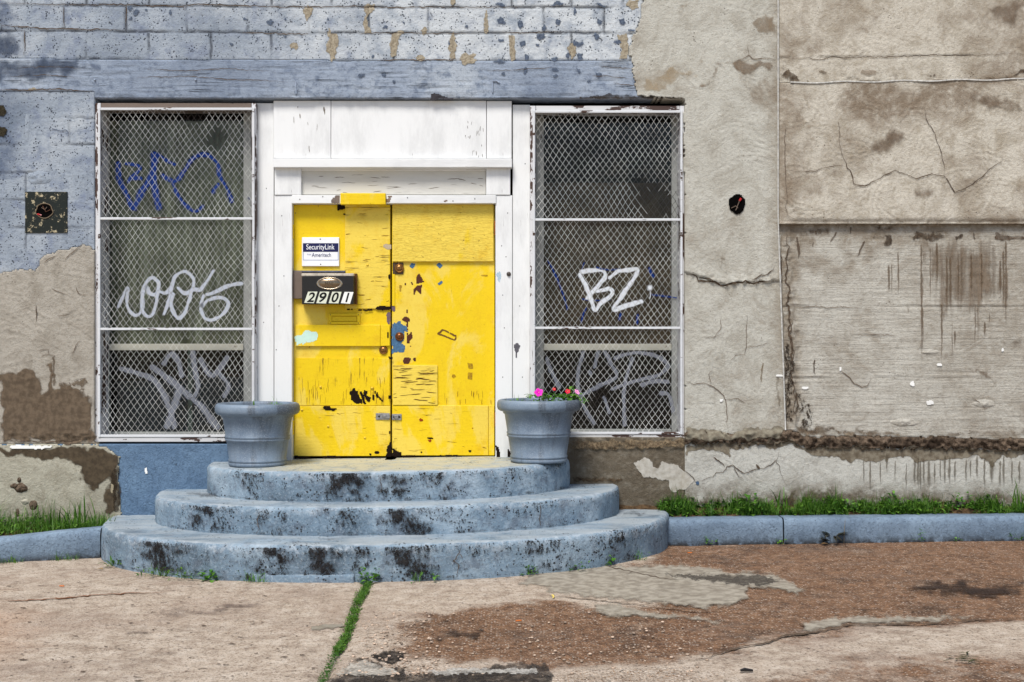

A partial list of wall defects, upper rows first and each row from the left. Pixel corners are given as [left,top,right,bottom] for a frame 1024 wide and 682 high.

peeling [363,4,405,57]
peeling [448,25,477,65]
peeling [484,3,561,75]
peeling [551,3,606,83]
peeling [613,0,639,59]
crack [686,114,1009,432]
leakage [685,345,1024,484]
flaking render [10,477,37,516]
spalling [111,467,121,512]
leakage [127,467,650,582]
peeling [634,457,699,492]
crack [687,457,784,481]